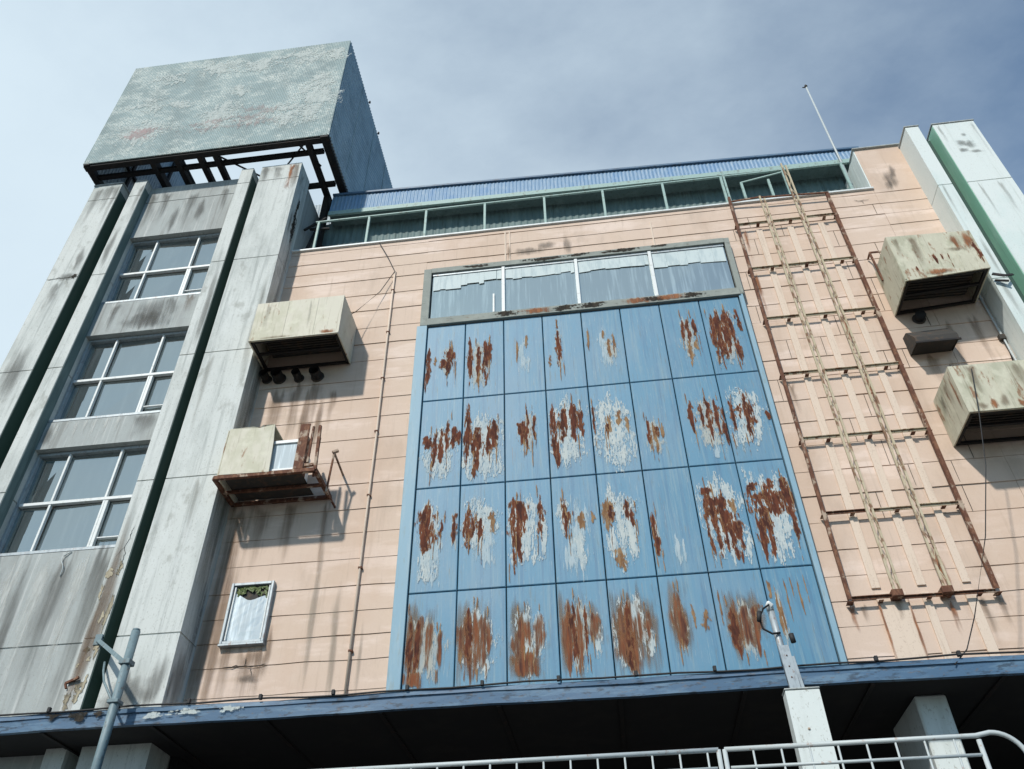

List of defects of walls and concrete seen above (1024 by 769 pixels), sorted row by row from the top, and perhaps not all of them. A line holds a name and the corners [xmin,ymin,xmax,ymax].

rust [419,391,665,484]
rust [684,386,771,460]
rust [414,482,687,586]
rust [670,467,810,665]
spalling [62,560,123,711]
rust [402,597,545,688]
rust [559,588,658,677]
peeling [143,708,200,719]